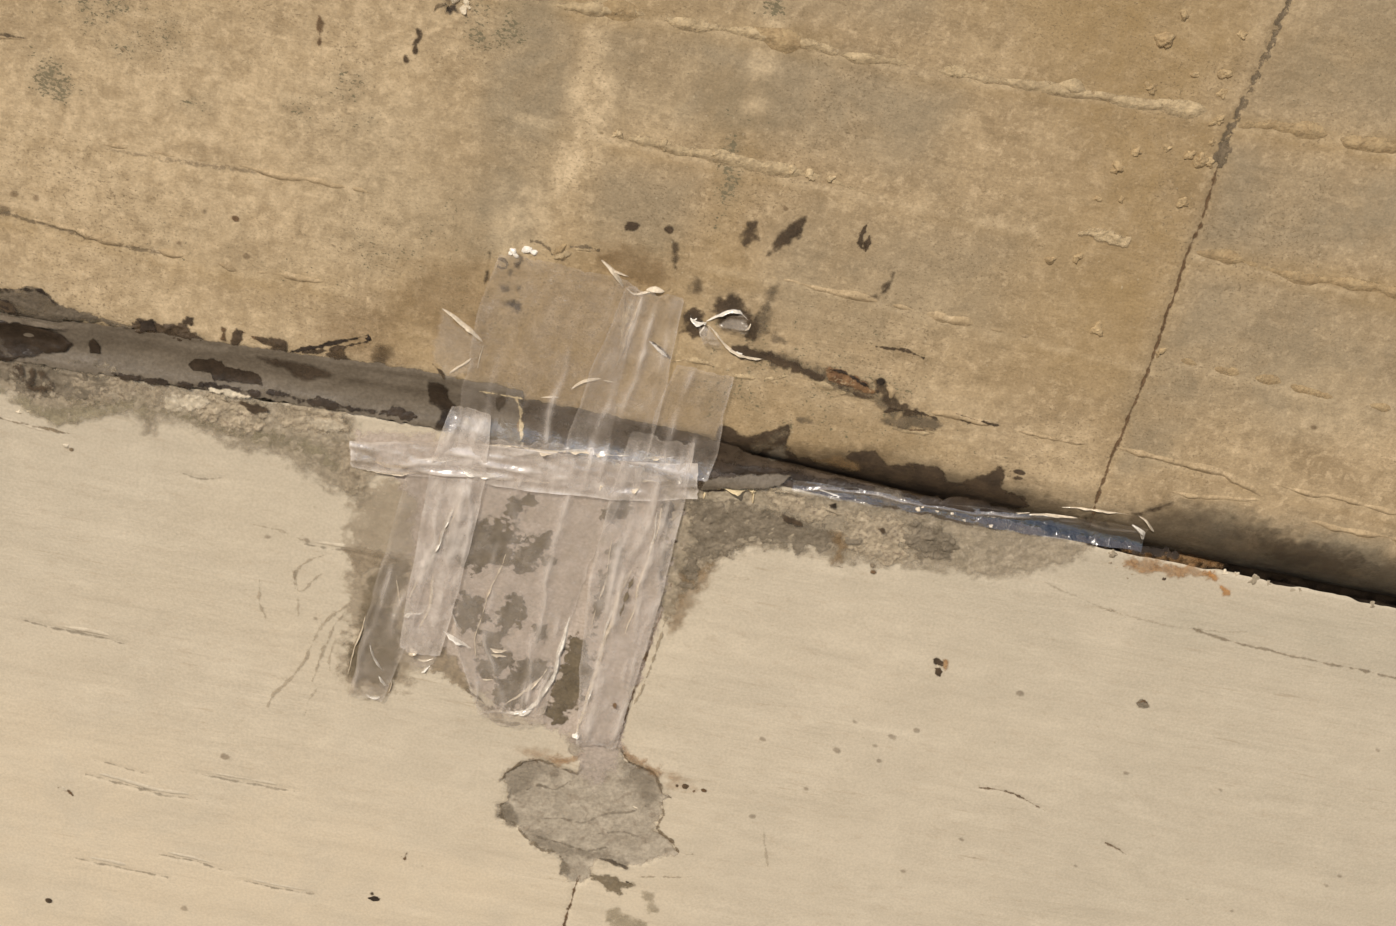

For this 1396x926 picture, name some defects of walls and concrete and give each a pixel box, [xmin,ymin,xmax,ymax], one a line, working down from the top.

spalling [434,0,473,15]
peeling [0,286,132,329]
crack [1088,0,1292,528]
damp [714,418,1029,509]
spalling [497,738,707,882]
crack [563,875,580,926]